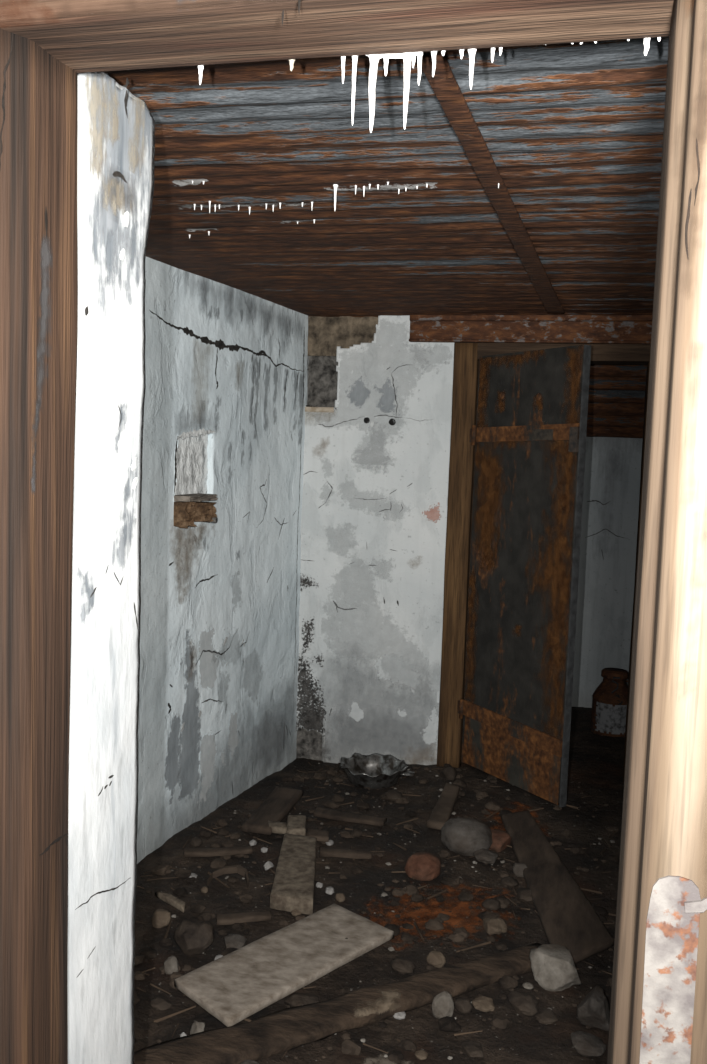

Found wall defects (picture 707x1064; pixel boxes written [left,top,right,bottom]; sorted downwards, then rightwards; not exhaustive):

water stain [324,182,438,192]
spalling [307,316,378,356]
crack [150,311,423,605]
water stain [296,619,326,739]
crack [75,878,130,910]